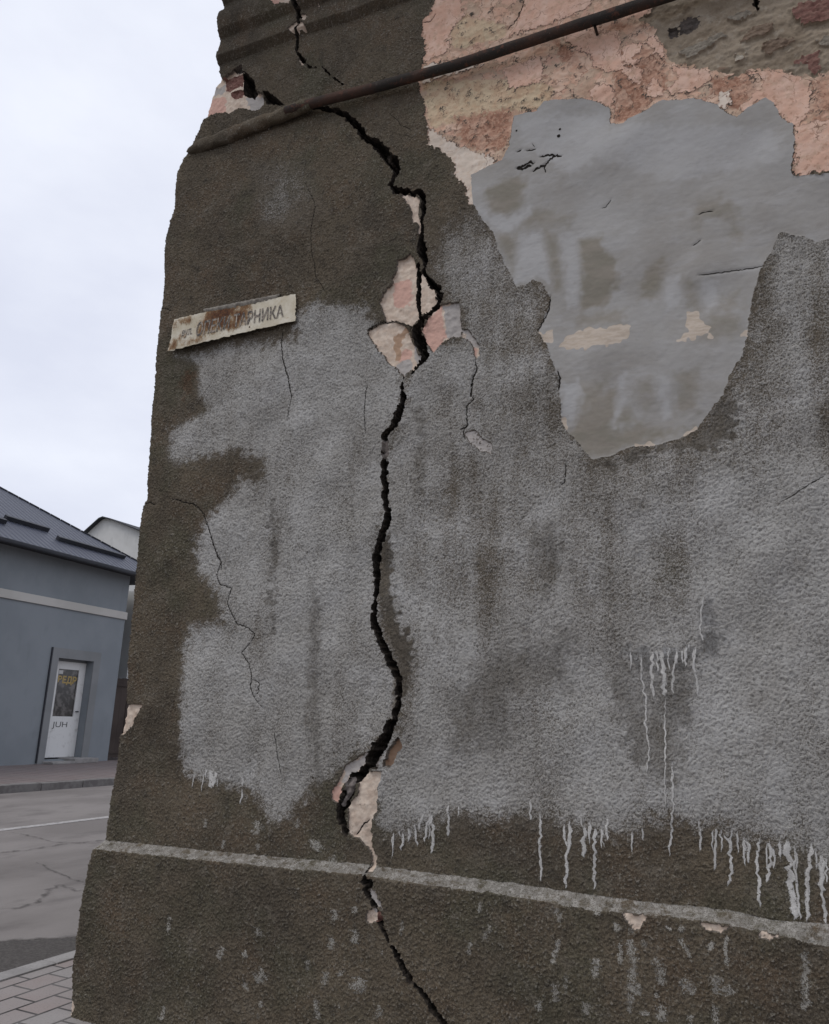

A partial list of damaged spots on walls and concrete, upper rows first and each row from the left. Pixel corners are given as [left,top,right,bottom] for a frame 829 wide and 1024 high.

flaking render [208,64,284,117]
crack [517,145,562,172]
peeling [417,0,829,205]
rust [168,304,252,351]
flaking render [367,252,480,377]
crack [291,0,444,837]
water stain [620,596,710,856]
flaking render [331,737,402,873]
water stain [391,804,460,859]
water stain [563,817,609,889]
water stain [698,821,829,923]
crack [360,864,448,1024]